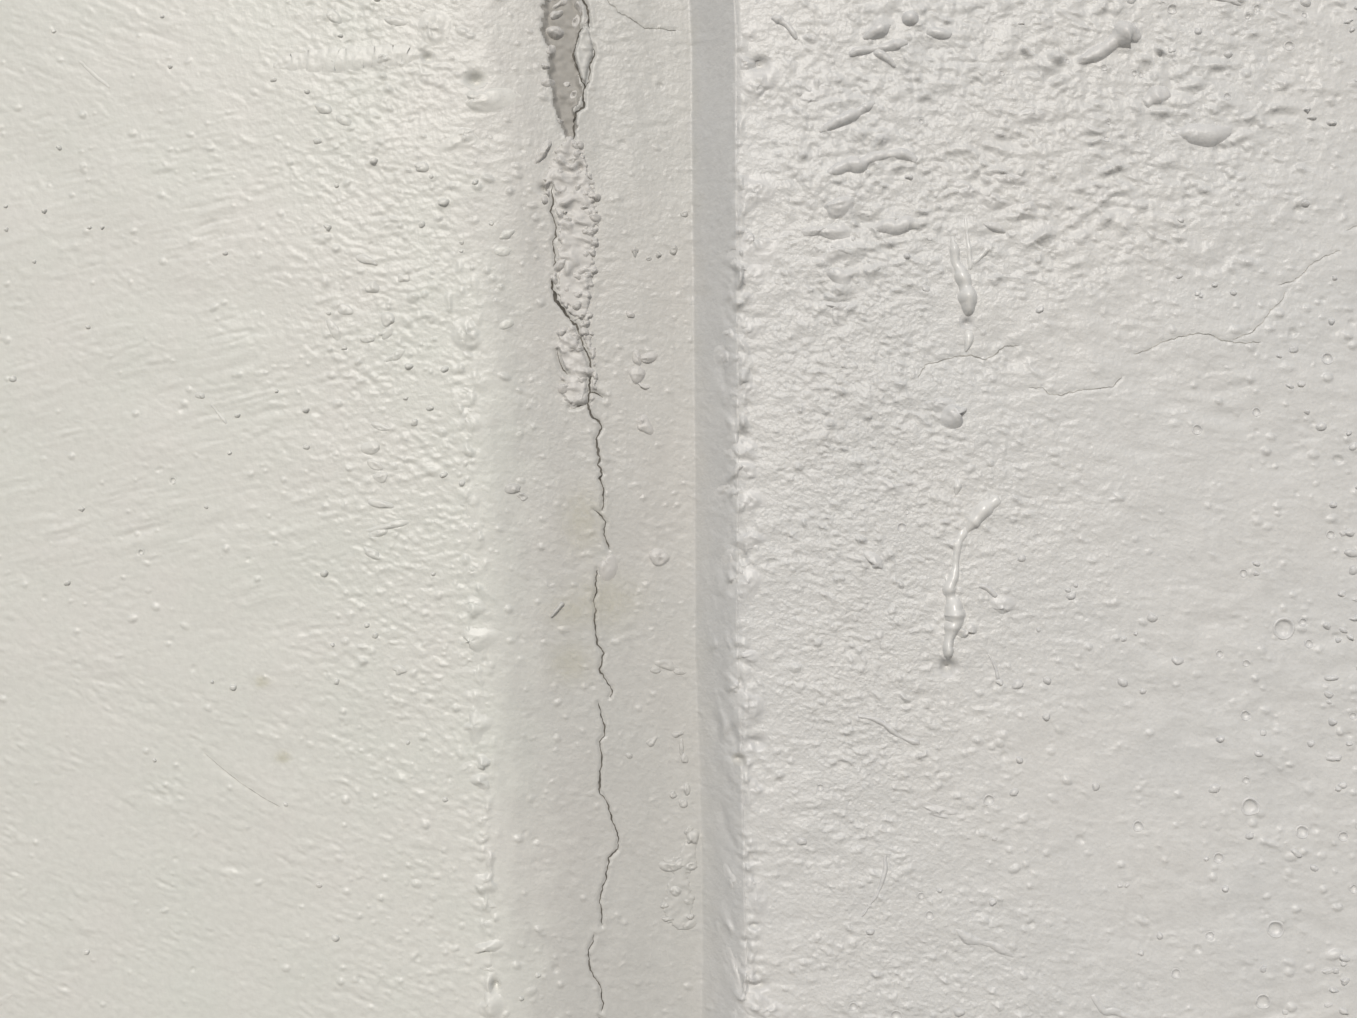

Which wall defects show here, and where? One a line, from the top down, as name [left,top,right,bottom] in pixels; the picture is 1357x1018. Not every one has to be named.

crack [550,186,619,1011]